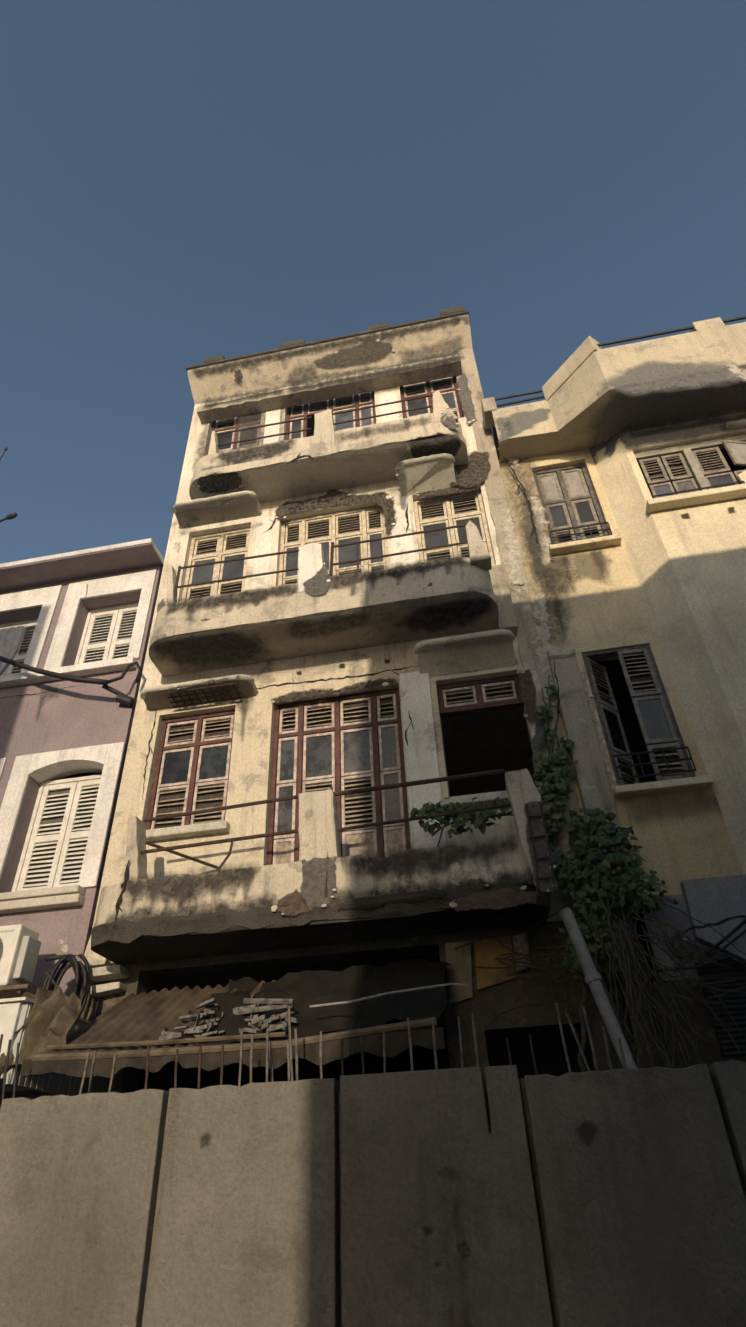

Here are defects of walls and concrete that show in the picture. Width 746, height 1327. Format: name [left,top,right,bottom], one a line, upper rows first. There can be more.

spalling [314,339,395,369]
peeling [725,362,746,379]
spalling [275,373,490,535]
spalling [197,471,242,493]
damp [505,458,564,640]
flaking render [303,563,331,596]
spalling [165,675,243,708]
flaking render [300,858,337,910]
damp [332,836,534,906]